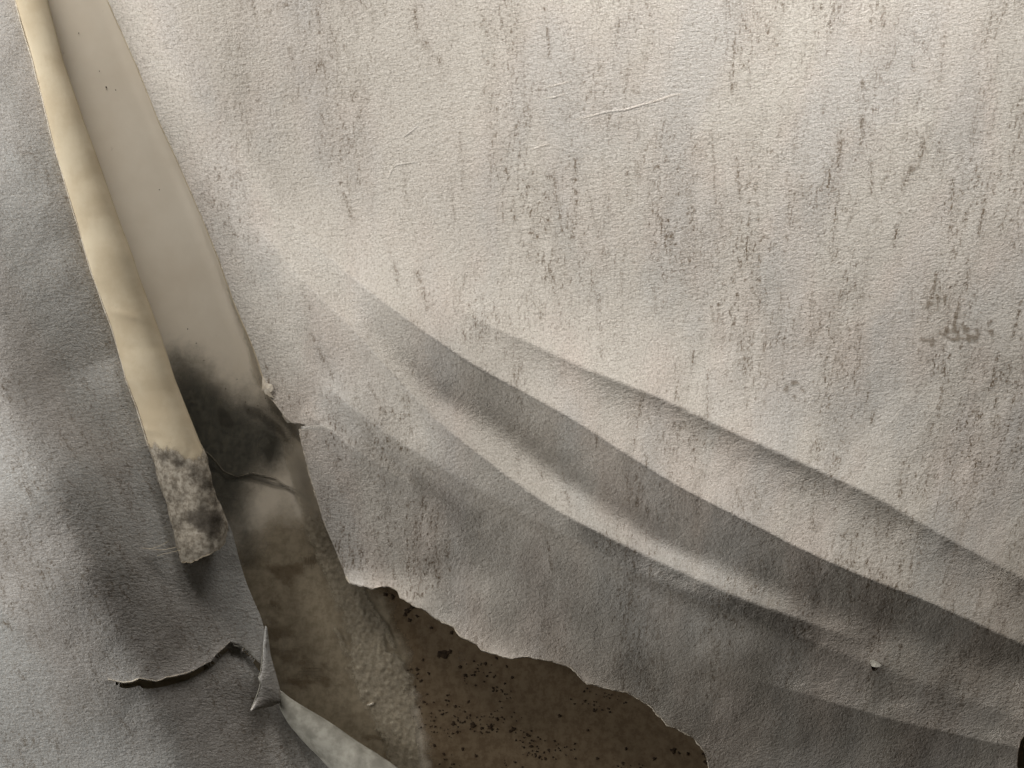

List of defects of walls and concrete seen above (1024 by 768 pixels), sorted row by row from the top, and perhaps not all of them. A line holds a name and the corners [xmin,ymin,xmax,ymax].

peeling [262,377,274,398]
damp [148,357,391,762]